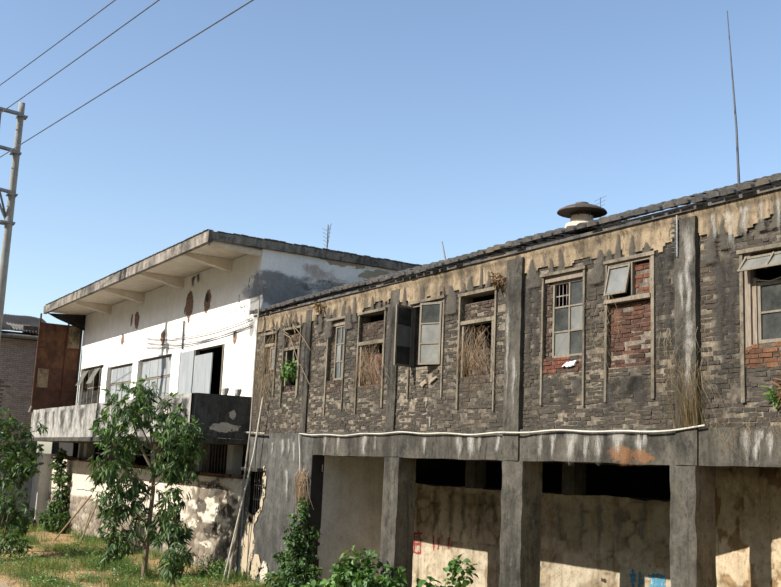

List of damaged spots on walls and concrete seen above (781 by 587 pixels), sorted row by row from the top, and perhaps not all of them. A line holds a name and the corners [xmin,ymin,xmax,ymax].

flaking render [184,291,193,323]
water stain [243,271,357,392]
water stain [525,249,564,361]
water stain [589,234,690,355]
water stain [701,215,738,360]
flaking render [209,410,241,433]
mould [195,478,235,519]
mould [203,521,236,557]
flaking render [240,466,267,585]